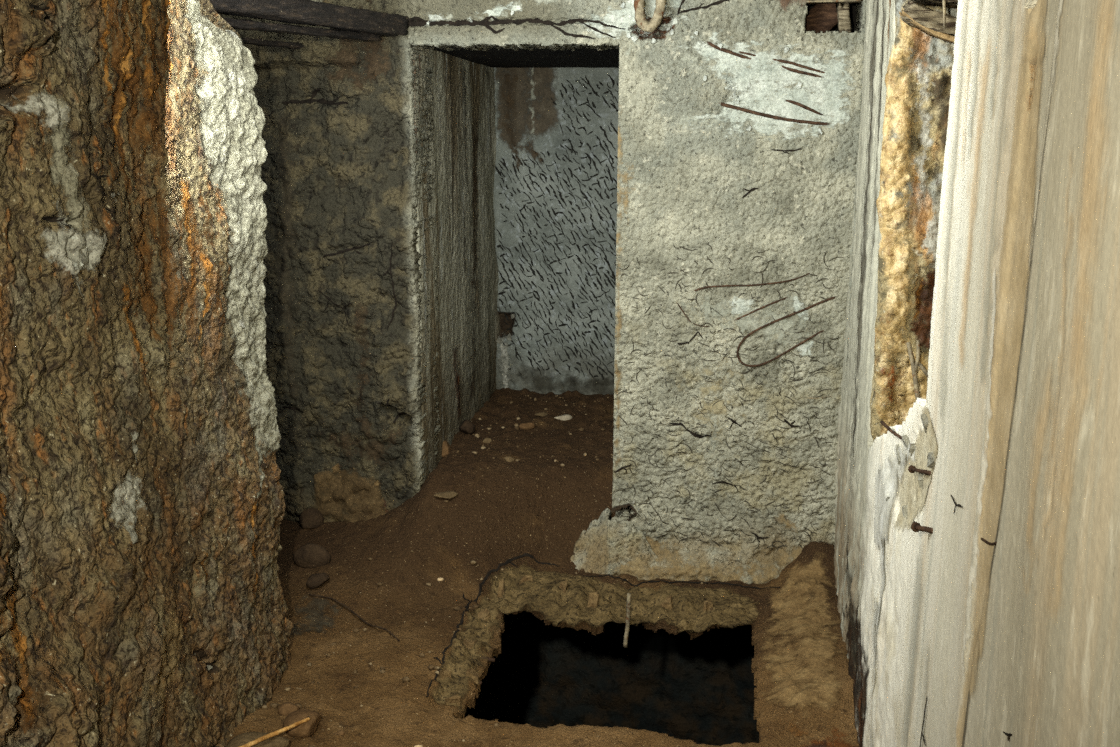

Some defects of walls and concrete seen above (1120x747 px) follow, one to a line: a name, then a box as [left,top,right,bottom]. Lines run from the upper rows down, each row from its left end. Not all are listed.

crack [408,16,625,39]
rust [911,270,935,349]
crack [615,244,840,553]
spalling [896,407,938,531]